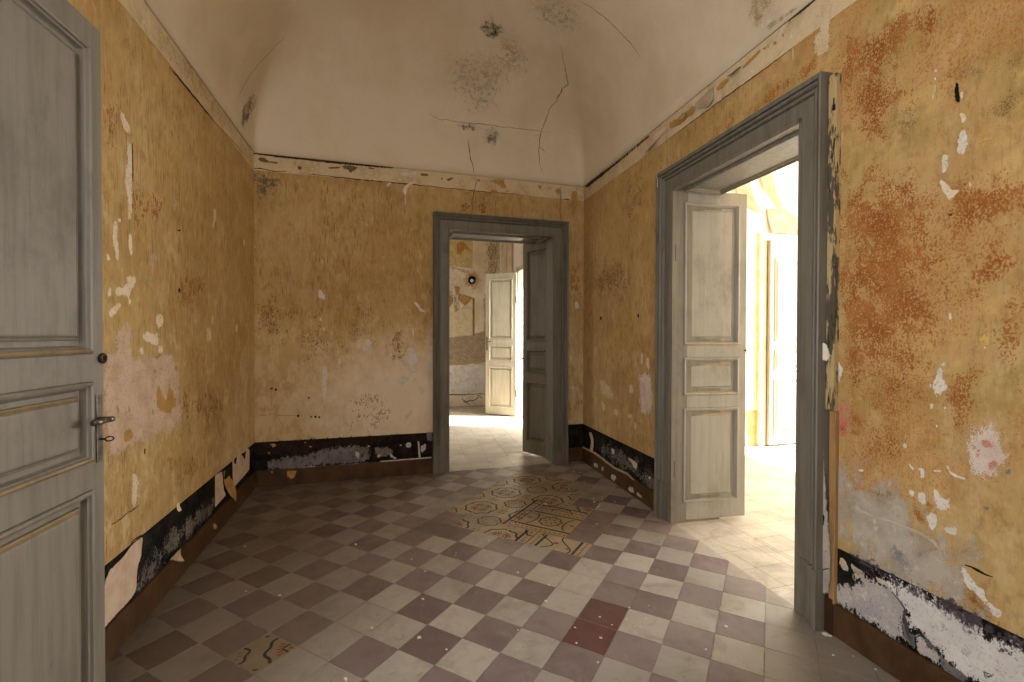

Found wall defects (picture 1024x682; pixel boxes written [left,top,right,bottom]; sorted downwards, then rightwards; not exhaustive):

peeling [107,111,133,260]
damp [437,17,532,149]
peeling [669,106,696,128]
peeling [940,113,972,200]
flaking render [103,275,183,464]
peeling [929,361,947,409]
peeling [255,432,433,473]
flaking render [909,422,1015,481]
flaking render [823,444,1024,682]